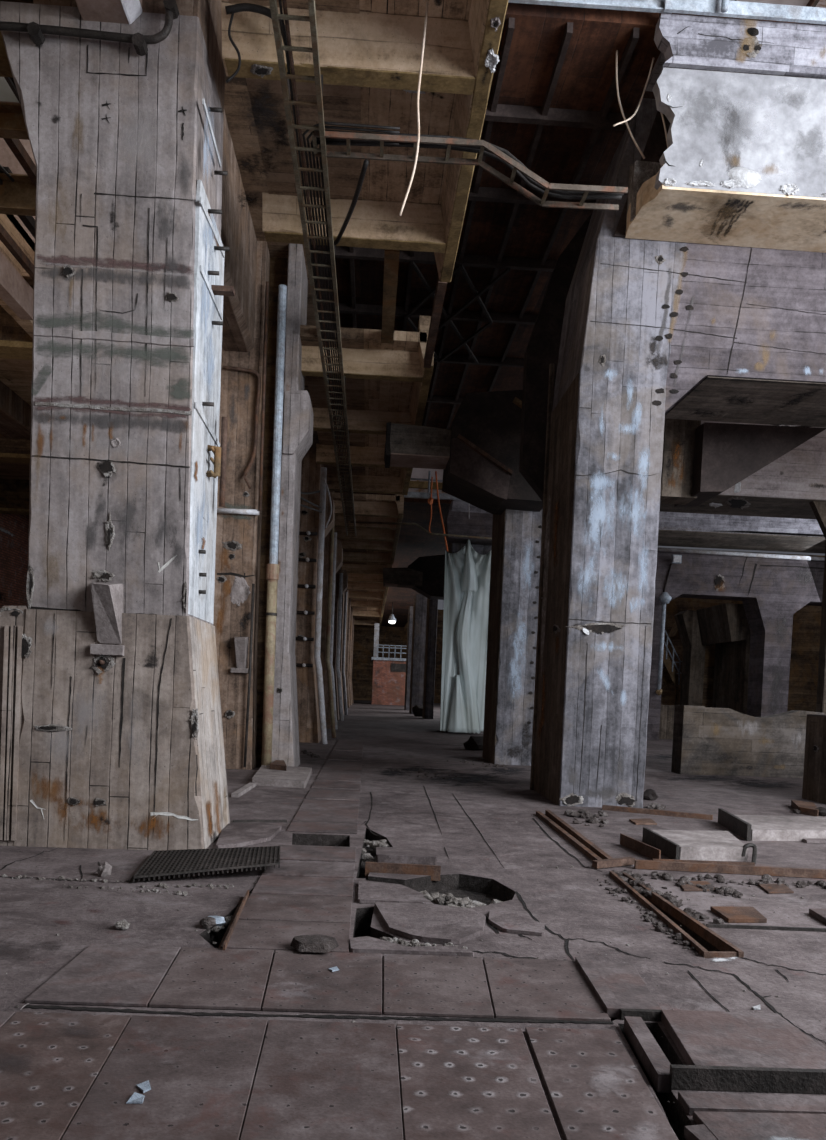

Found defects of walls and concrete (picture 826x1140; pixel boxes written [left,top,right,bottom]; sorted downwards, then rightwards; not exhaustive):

leakage [42,259,187,287]
leakage [38,341,188,365]
spalling [565,623,626,635]
crack [424,787,502,865]
crack [532,818,602,872]
crack [473,891,826,1044]